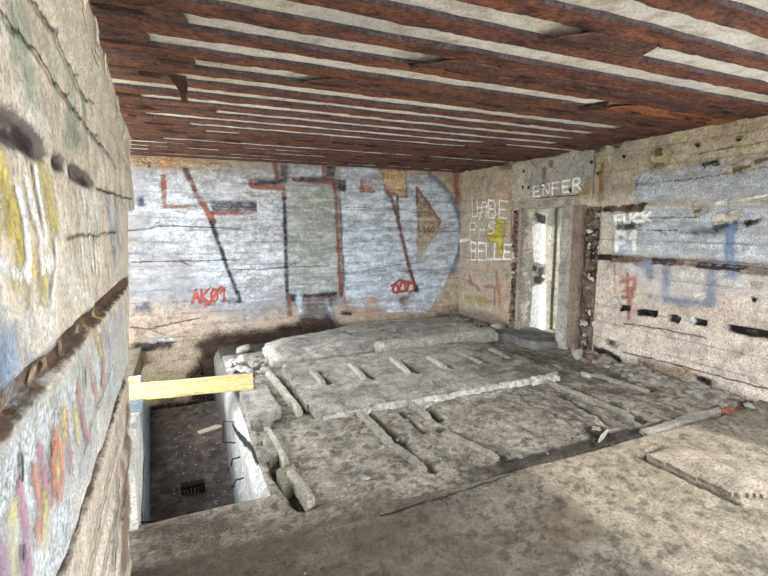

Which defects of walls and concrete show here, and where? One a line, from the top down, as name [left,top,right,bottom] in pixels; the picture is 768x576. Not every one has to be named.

crack [0,0,116,169]
peeling [55,0,768,175]
crack [96,187,132,203]
spalling [693,206,760,230]
crack [67,222,240,240]